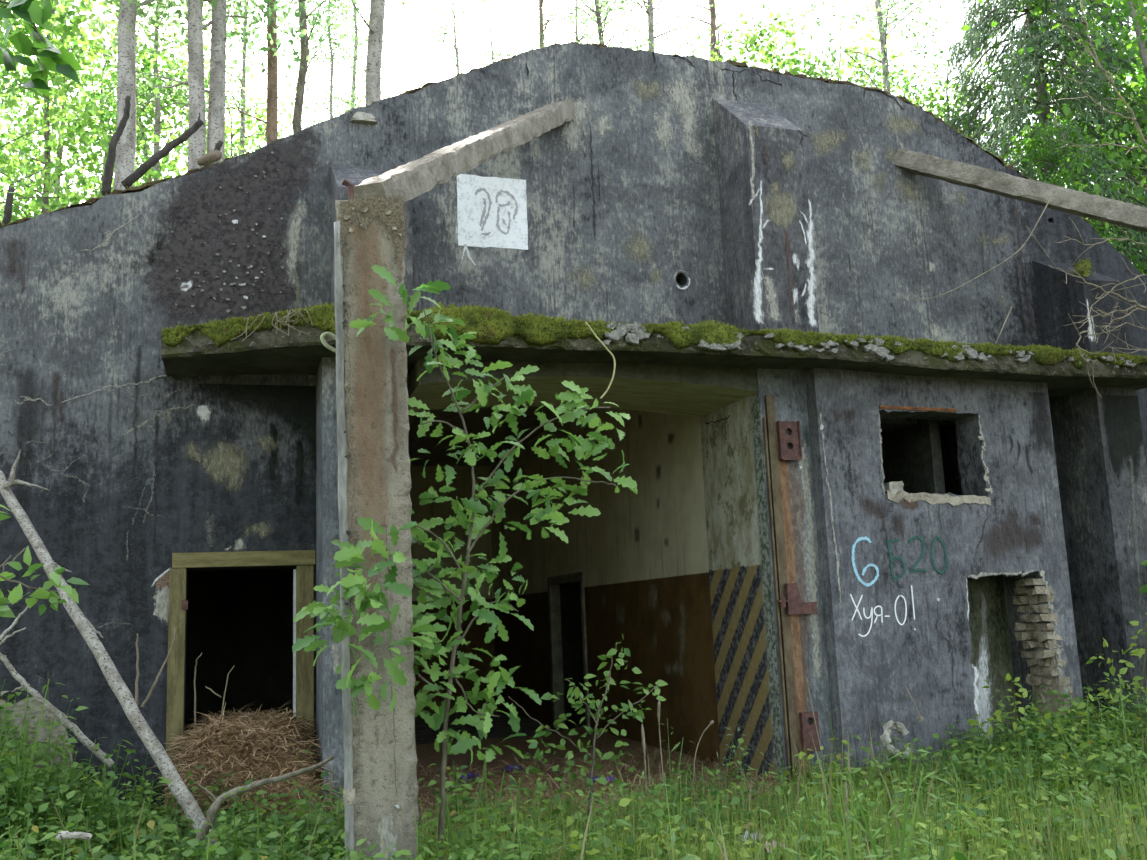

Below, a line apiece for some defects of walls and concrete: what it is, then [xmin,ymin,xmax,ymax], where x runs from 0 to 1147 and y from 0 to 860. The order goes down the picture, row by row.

water stain [749,180,779,323]
water stain [793,200,816,326]
spalling [978,416,993,494]
spalling [966,570,1077,709]